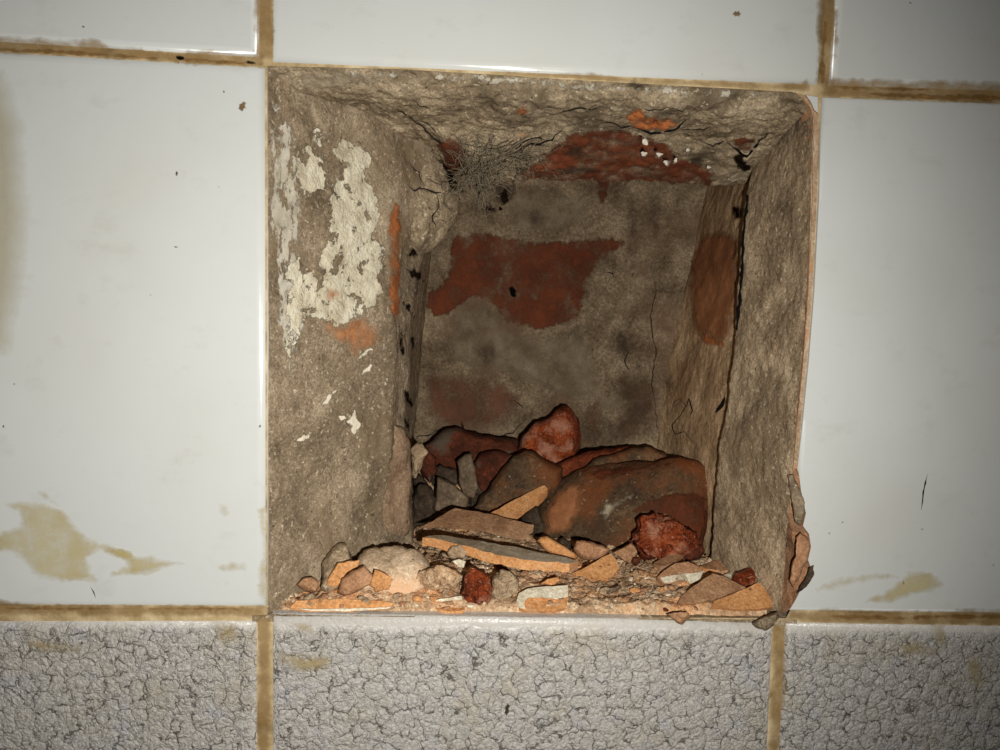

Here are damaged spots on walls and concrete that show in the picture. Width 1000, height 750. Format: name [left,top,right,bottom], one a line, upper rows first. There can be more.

flaking render [435,74,690,96]
crack [396,99,441,143]
spalling [522,110,713,200]
crack [509,106,768,158]
crack [408,163,442,226]
spalling [270,107,624,375]
spalling [691,233,736,347]
crack [734,195,749,330]
peeling [339,410,361,435]
damp [116,551,156,573]
spalling [781,468,814,612]
damp [885,575,931,599]